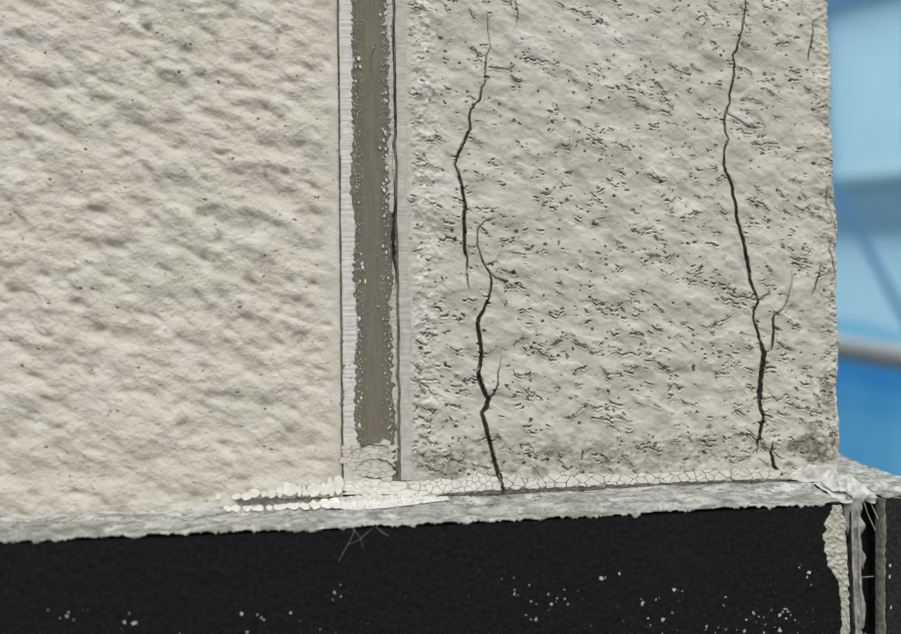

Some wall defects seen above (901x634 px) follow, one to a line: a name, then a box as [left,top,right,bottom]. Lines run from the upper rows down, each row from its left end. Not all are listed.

crack [436,0,835,497]
peeling [823,504,850,634]